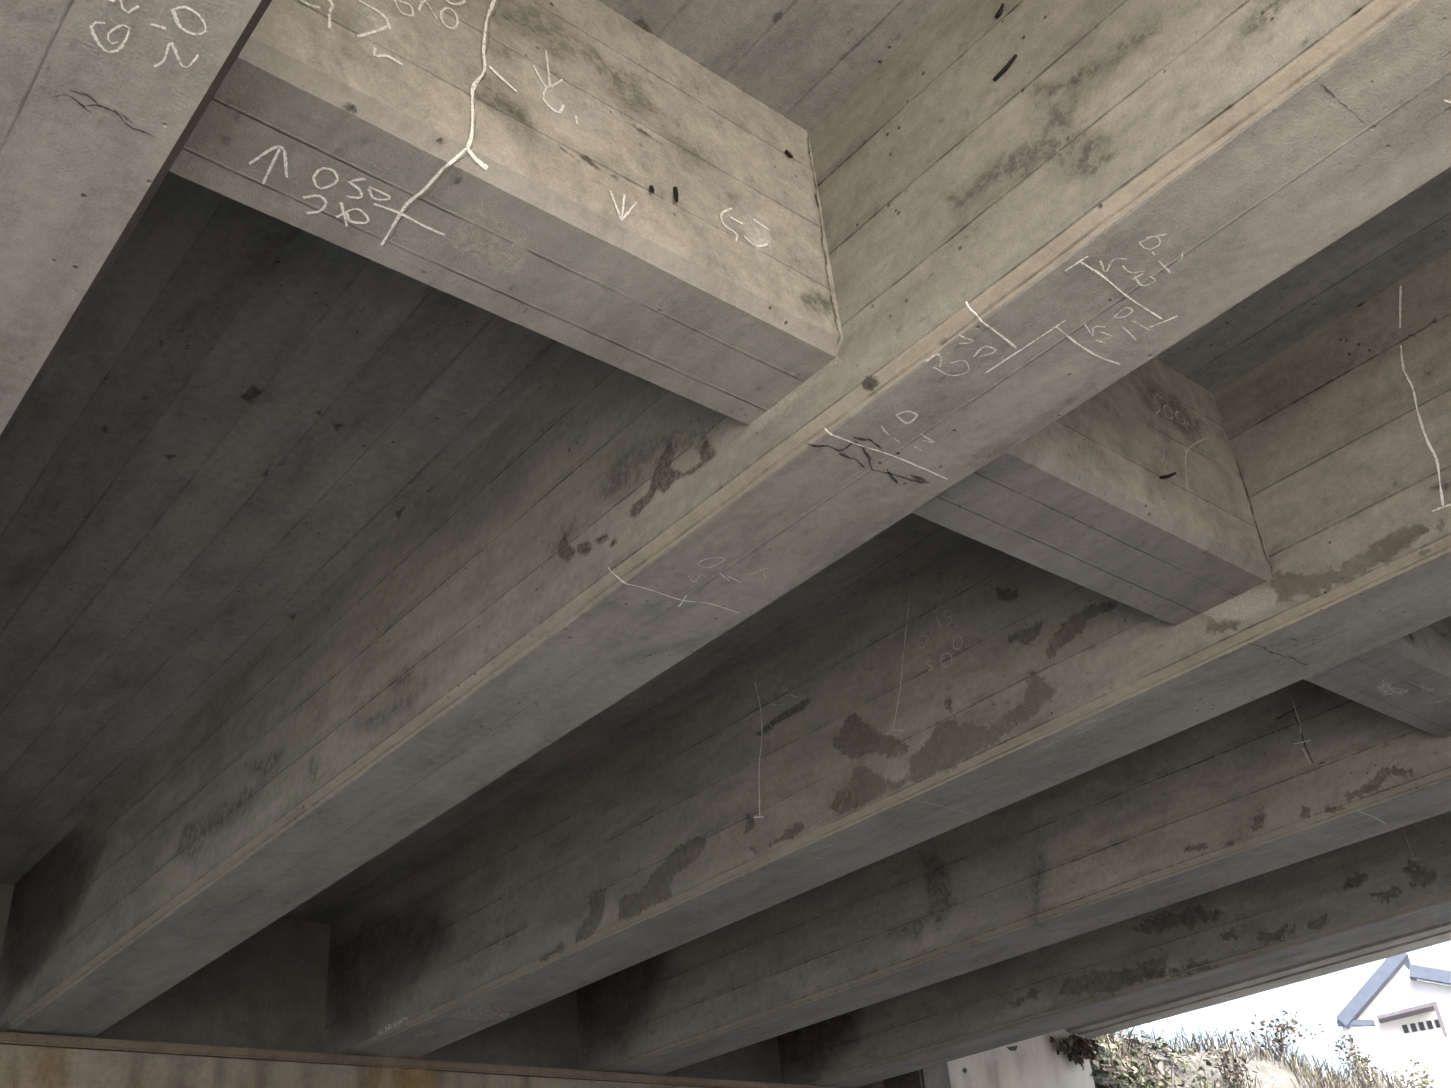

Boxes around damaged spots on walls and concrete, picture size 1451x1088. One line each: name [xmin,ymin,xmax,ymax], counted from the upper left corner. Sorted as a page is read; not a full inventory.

water stain [630,442,715,516]
crack [807,437,929,484]
water stain [558,535,616,560]